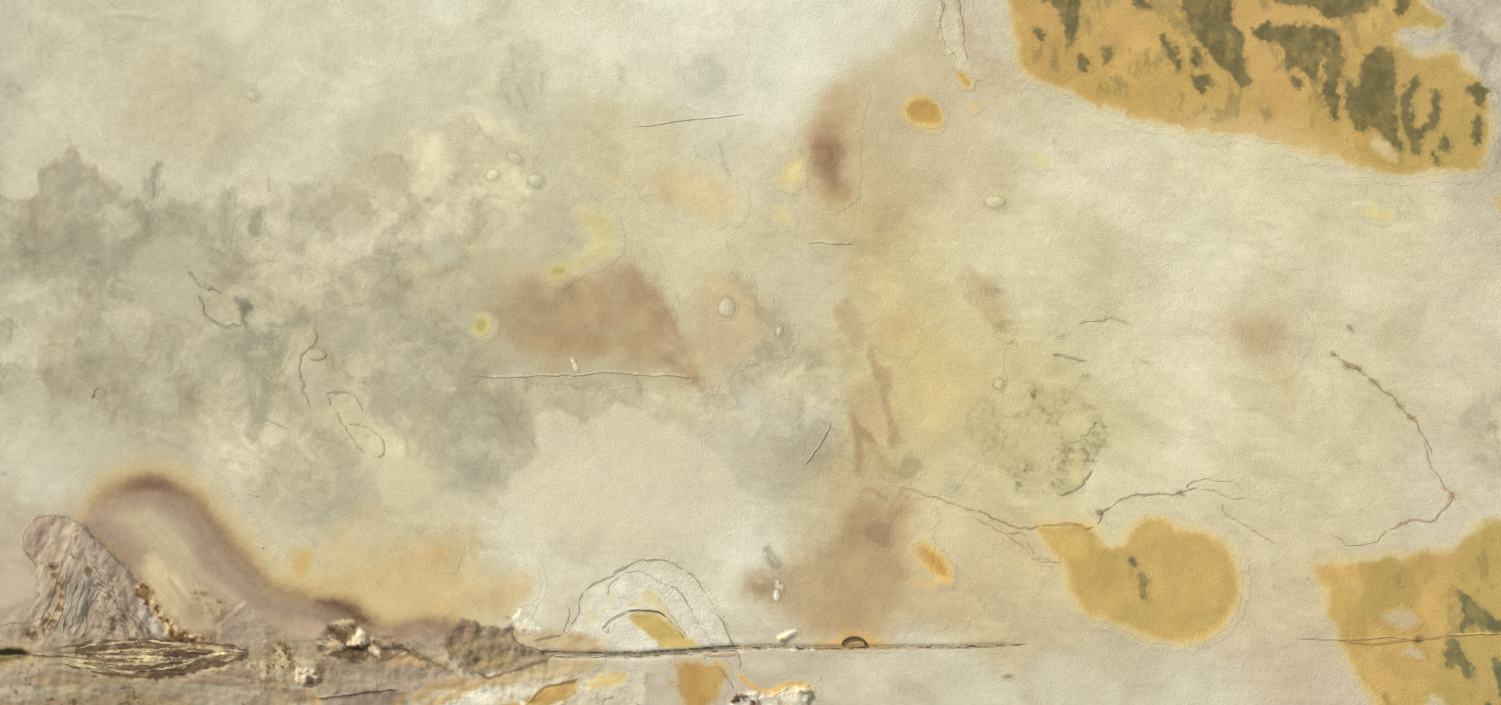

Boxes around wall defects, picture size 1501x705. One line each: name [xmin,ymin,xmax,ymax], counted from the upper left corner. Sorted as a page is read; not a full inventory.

water stain [128,160,163,223]
water stain [213,187,267,253]
water stain [393,77,871,405]
water stain [187,269,327,430]
crack [1329,324,1460,546]
crack [902,476,1273,566]
flaking render [0,510,735,705]
crack [443,615,1025,683]
flaking render [772,579,786,602]
flaking render [776,626,800,645]
flaking render [841,636,867,646]
spalling [705,689,812,705]